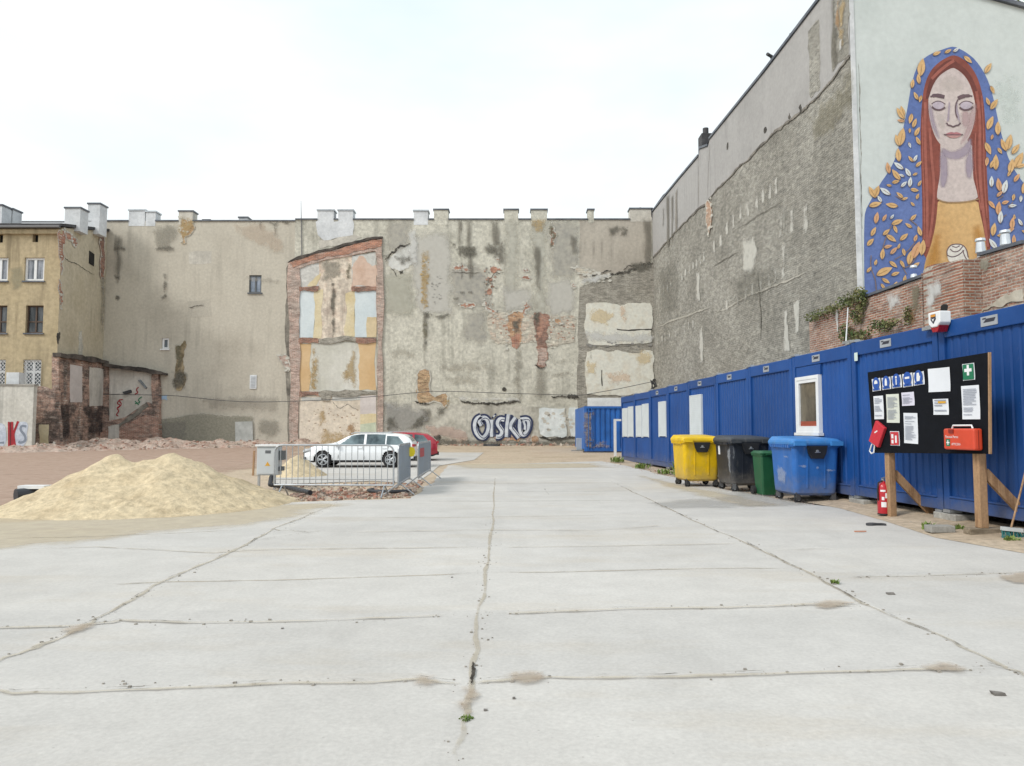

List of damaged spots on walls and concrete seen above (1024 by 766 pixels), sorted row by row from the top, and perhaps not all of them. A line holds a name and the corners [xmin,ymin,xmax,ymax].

spalling [178,216,195,244]
peeling [385,243,412,277]
spalling [458,256,652,369]
spalling [173,340,187,391]
spalling [415,368,449,408]
crack [447,662,476,683]